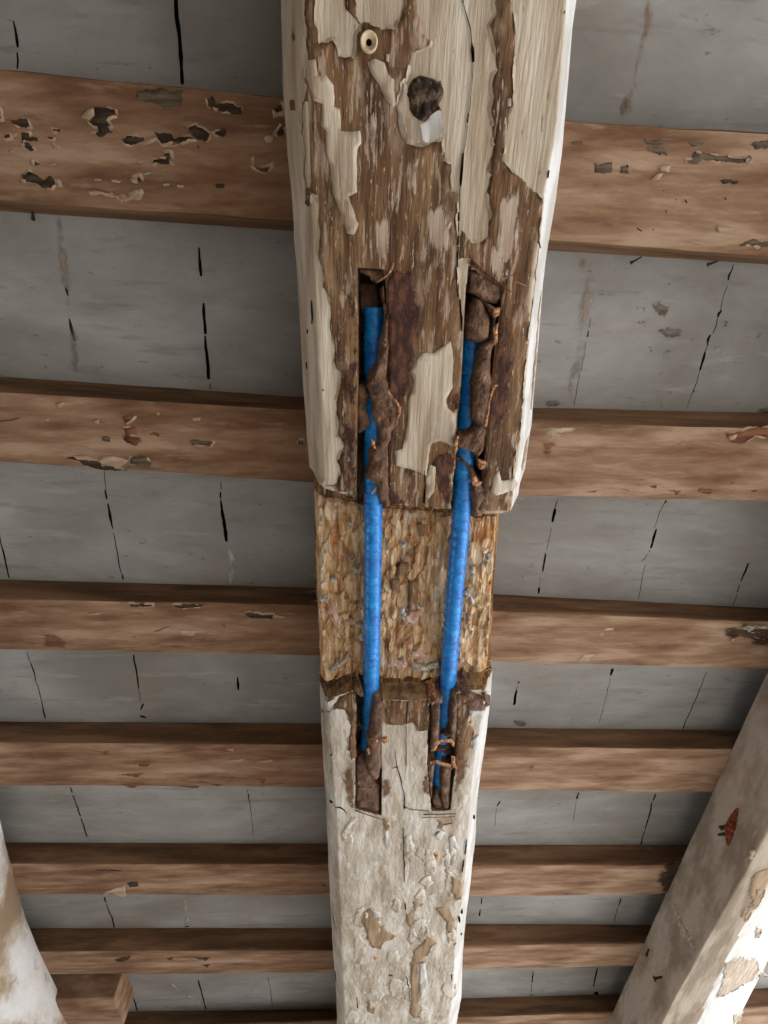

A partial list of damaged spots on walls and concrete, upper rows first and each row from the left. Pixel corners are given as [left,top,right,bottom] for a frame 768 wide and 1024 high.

crack [174,0,184,85]
peeling [0,107,63,191]
peeling [81,106,227,203]
crack [202,303,211,389]
peeling [272,0,548,769]
crack [686,264,734,409]
crack [104,472,124,580]
crack [538,500,558,594]
crack [638,500,667,600]
peeling [346,817,462,1024]
peeling [740,849,768,938]
peeling [716,956,767,998]